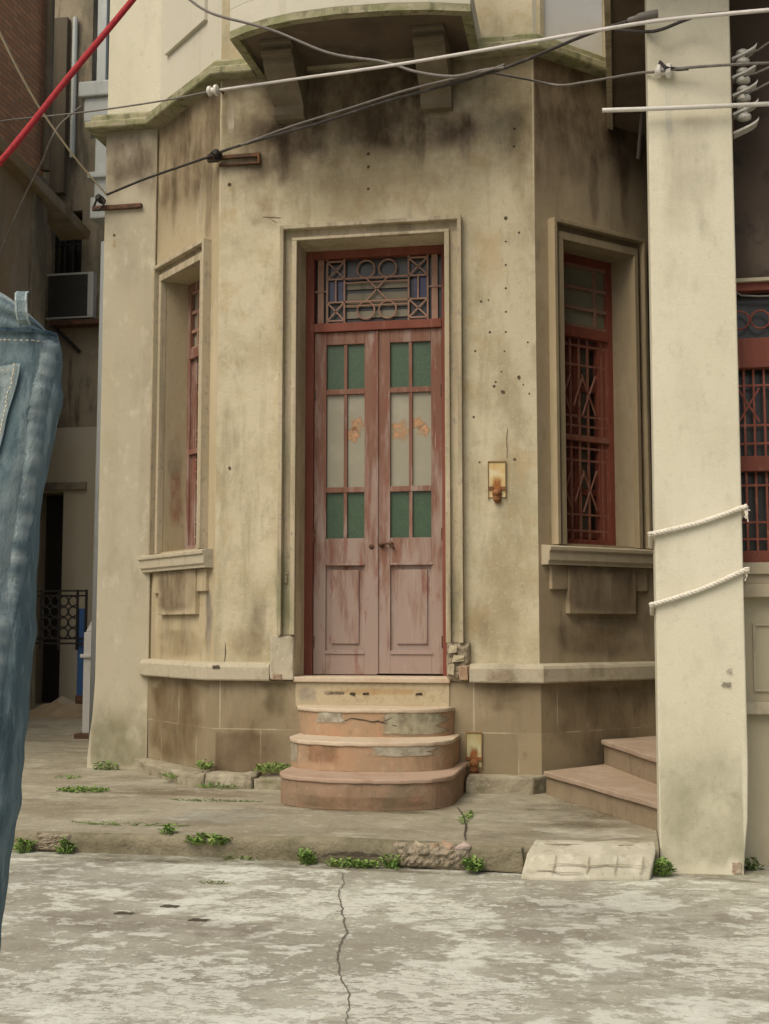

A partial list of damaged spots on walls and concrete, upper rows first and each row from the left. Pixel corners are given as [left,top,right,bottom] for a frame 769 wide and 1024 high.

flaking render [447,643,470,682]
crack [342,717,412,730]
spalling [393,840,471,869]
crack [458,808,644,875]
crack [266,852,385,1023]